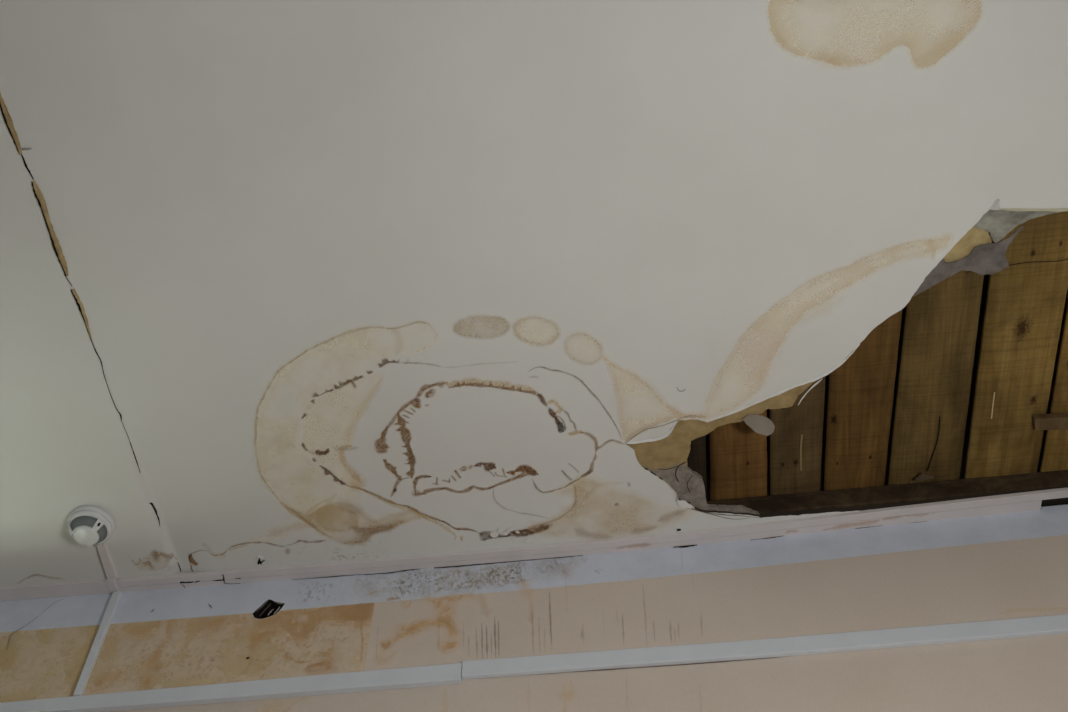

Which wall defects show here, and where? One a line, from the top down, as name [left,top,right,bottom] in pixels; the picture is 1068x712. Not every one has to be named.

crack [0,93,141,473]
leakage [302,382,607,531]
flaking render [629,381,815,515]
leakage [288,506,403,543]
leakage [66,626,122,697]
leakage [188,603,374,673]